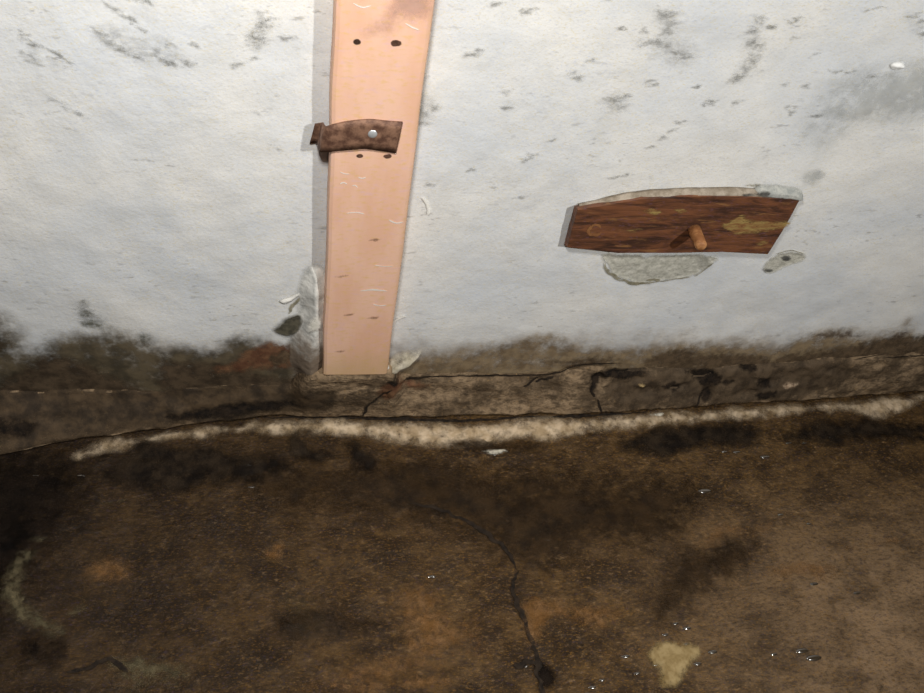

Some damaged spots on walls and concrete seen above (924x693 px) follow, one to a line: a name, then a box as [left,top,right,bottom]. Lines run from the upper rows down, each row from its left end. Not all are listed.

spalling [603,254,716,285]
spalling [764,250,805,273]
spalling [274,298,302,336]
crack [264,363,648,422]
water stain [401,331,924,410]
water stain [621,423,760,456]
water stain [783,419,924,446]
water stain [0,311,336,628]
water stain [110,440,693,569]
crack [410,502,554,693]